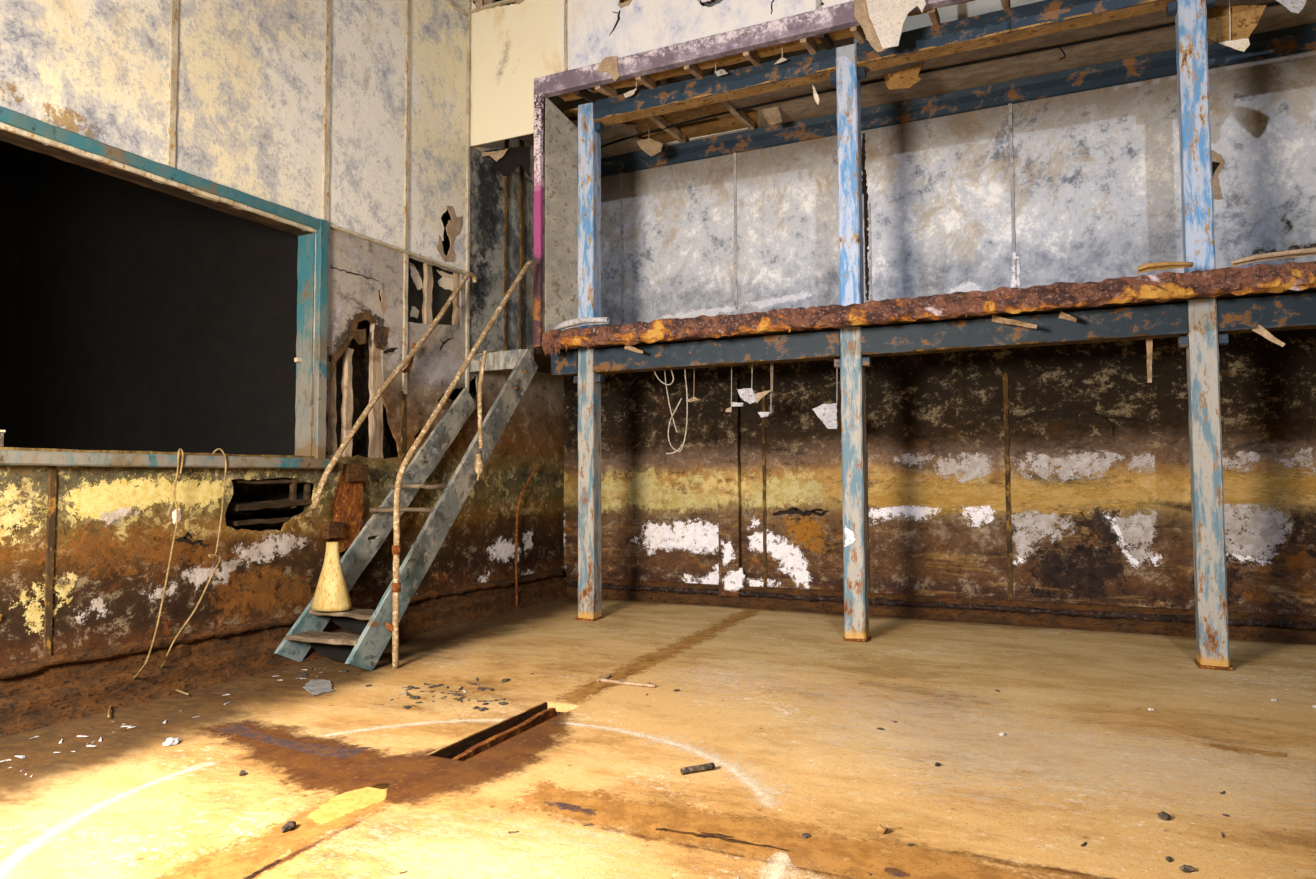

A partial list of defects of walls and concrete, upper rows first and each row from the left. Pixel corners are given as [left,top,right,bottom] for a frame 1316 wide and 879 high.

peeling [854,0,926,52]
rust [606,328,695,340]
rust [721,320,777,331]
rust [1000,293,1094,312]
rust [1110,293,1135,304]
spalling [326,320,398,459]
peeling [0,477,47,547]
spalling [225,478,295,531]
damp [601,465,827,591]
damp [868,450,1163,600]
damp [1222,447,1316,603]
damp [141,533,308,604]